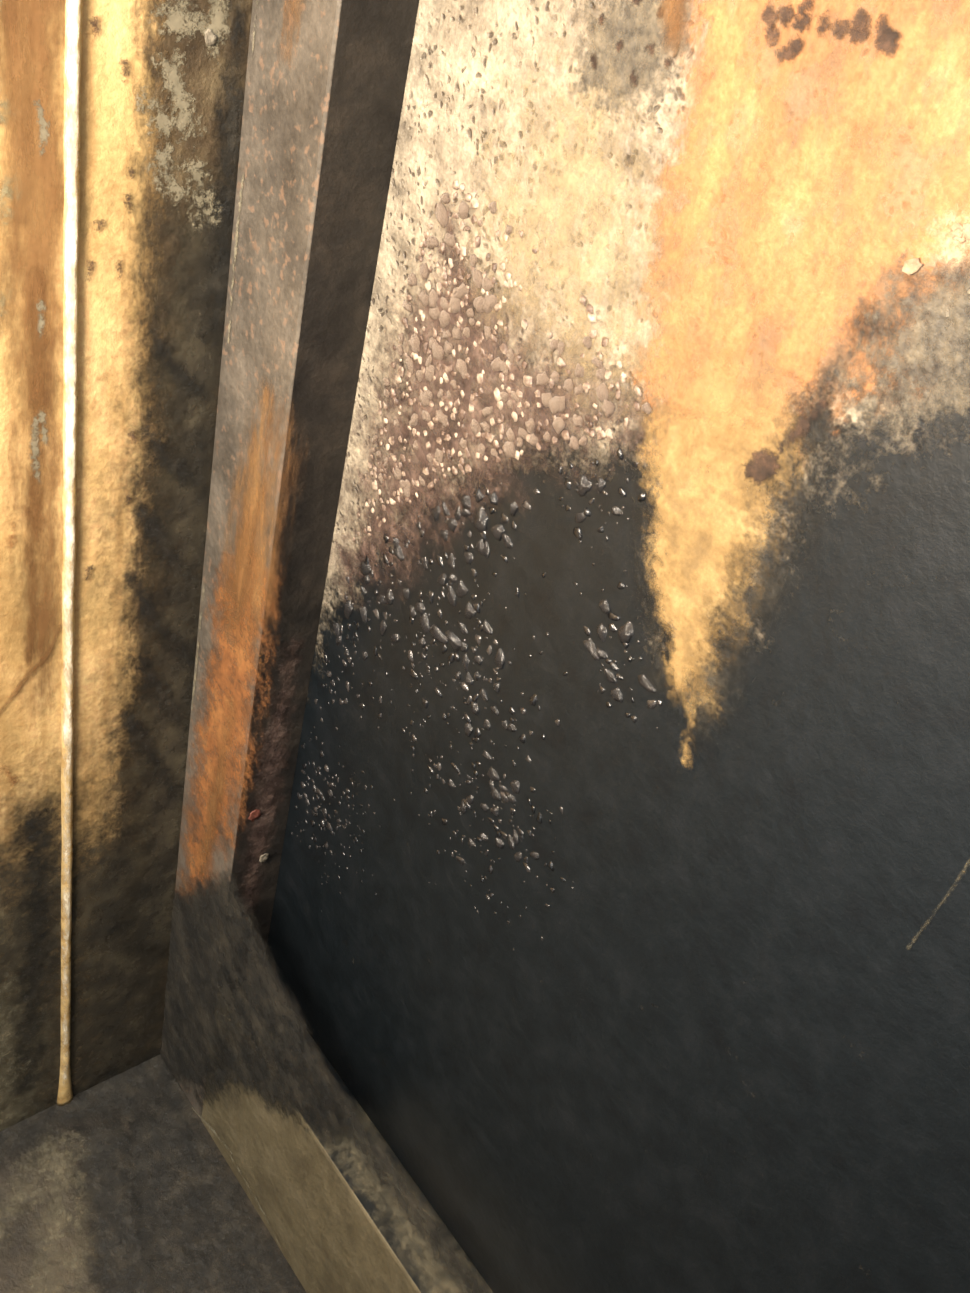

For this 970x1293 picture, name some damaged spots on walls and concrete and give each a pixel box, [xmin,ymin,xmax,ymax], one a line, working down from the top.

leakage [443,210,472,309]
leakage [494,94,653,368]
corrosion [574,0,970,436]
corrosion [181,390,299,916]